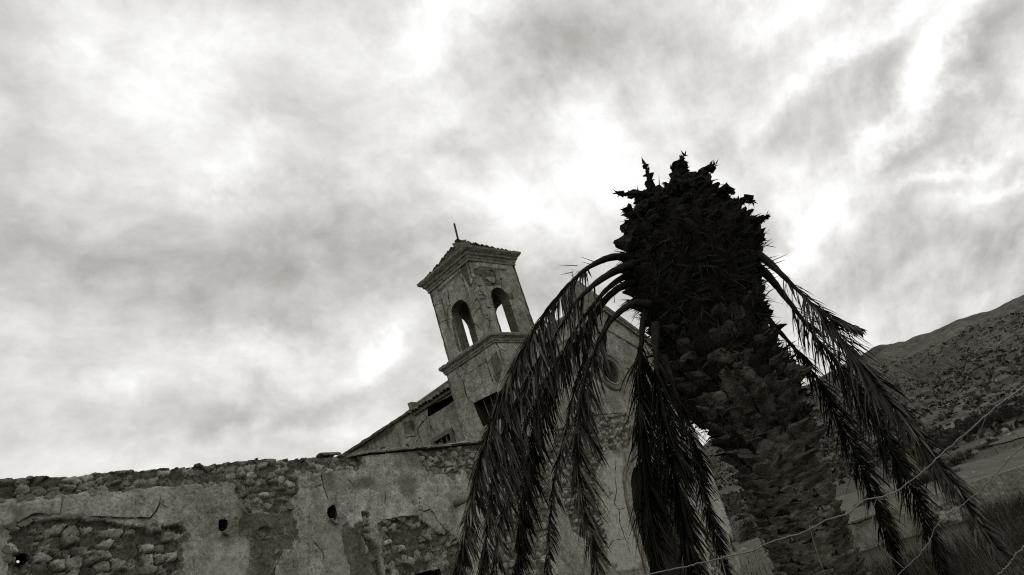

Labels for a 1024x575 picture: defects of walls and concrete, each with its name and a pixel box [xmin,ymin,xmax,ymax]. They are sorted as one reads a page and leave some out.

flaking render [0,451,363,575]
flaking render [342,512,469,575]
flaking render [418,413,633,575]
crack [609,464,630,551]